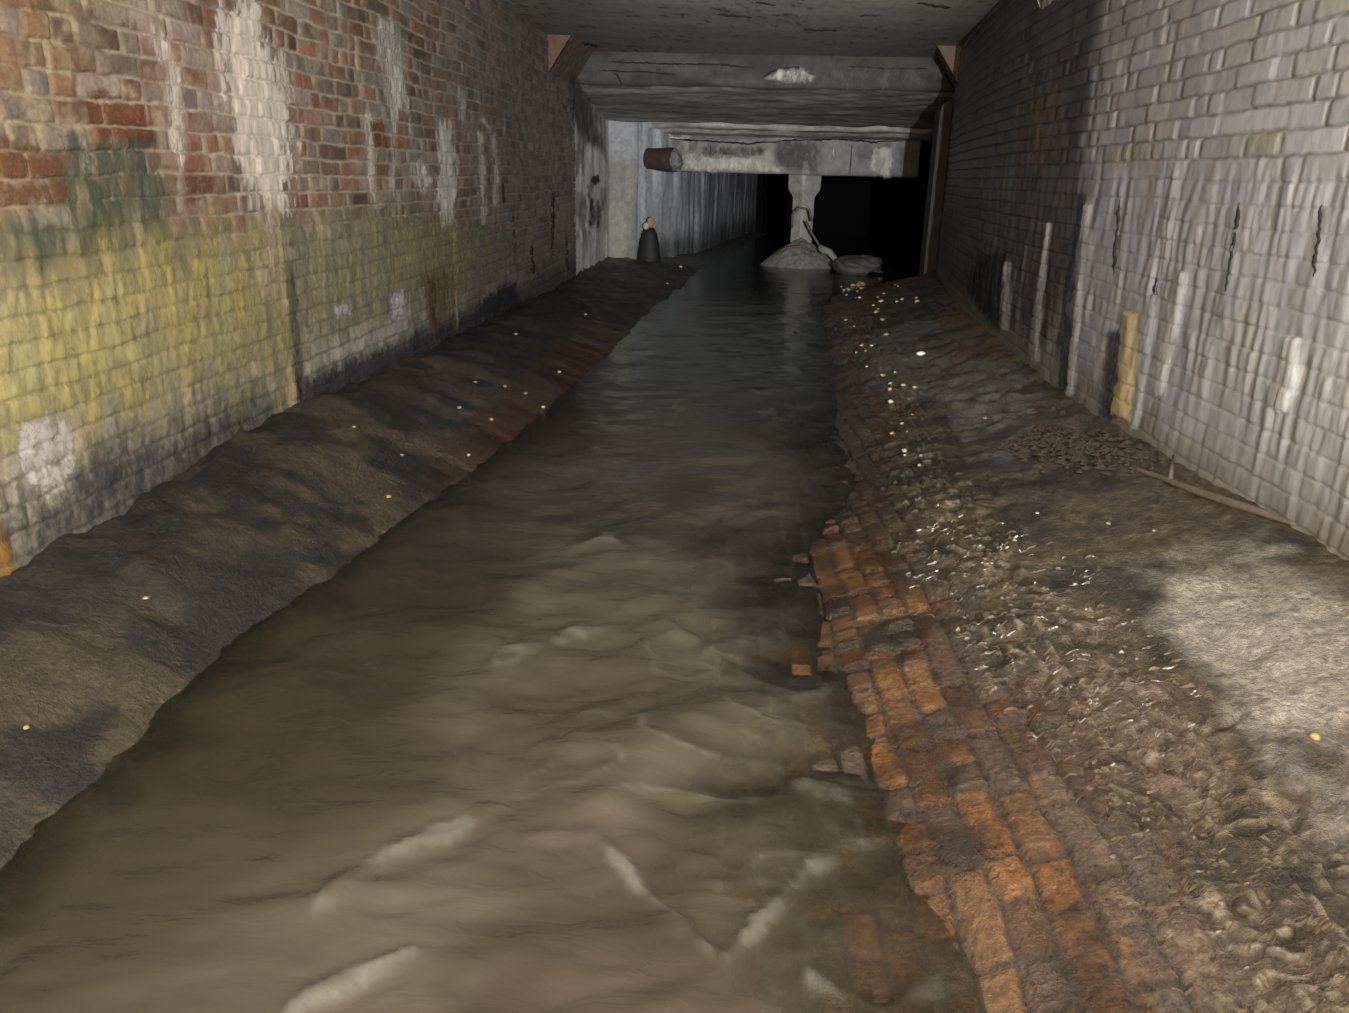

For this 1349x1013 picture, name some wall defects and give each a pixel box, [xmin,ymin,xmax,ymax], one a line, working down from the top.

efflorescence [149,21,188,166]
crack [565,42,812,83]
crack [717,1,776,18]
crack [803,14,881,32]
crack [916,1,951,9]
water stain [212,0,535,412]
water stain [1033,223,1051,362]
water stain [1059,194,1093,396]
water stain [1102,271,1189,429]
water stain [1274,337,1302,413]
water stain [16,408,249,545]
rust [0,527,16,576]